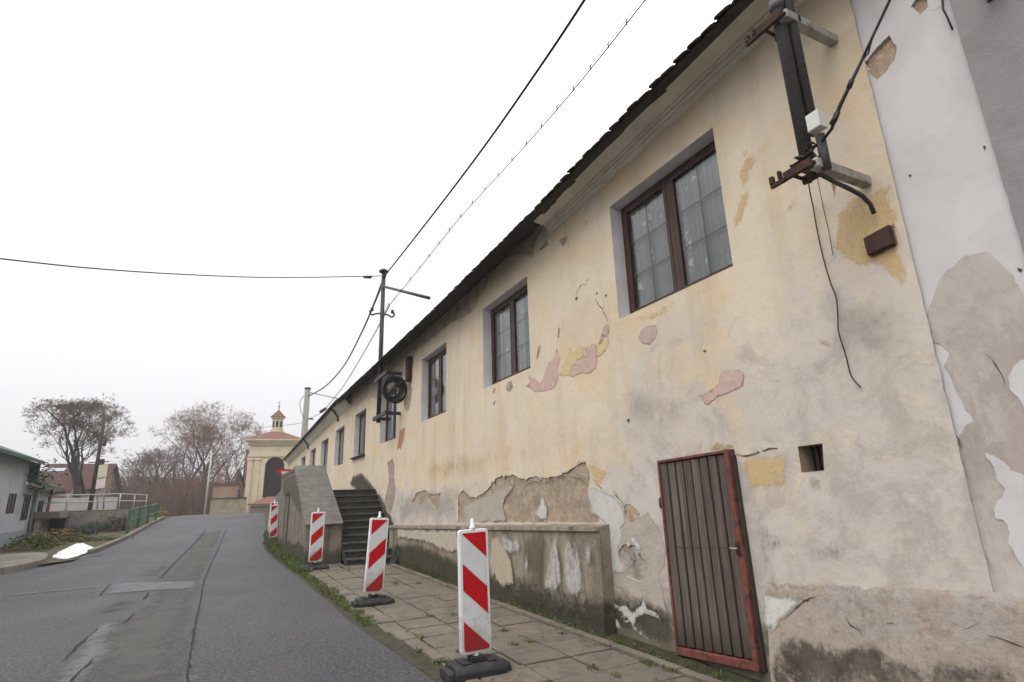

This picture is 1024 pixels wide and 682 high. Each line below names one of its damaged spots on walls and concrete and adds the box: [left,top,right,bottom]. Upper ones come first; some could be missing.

spalling [865,38,897,80]
peeling [638,307,666,345]
peeling [526,325,609,392]
peeling [698,370,744,405]
spalling [926,251,1024,595]
spalling [385,459,396,514]
spalling [413,490,441,513]
spalling [457,461,606,523]
spalling [623,504,640,523]
water stain [491,536,590,596]
spalling [620,543,647,581]
water stain [774,641,1010,682]